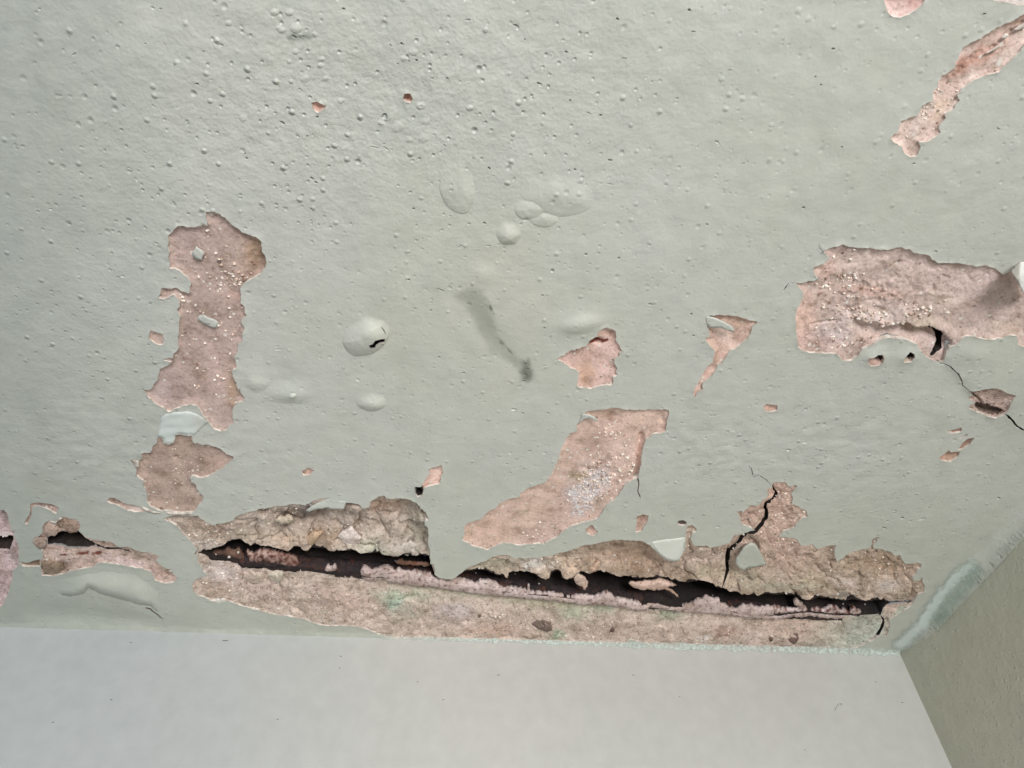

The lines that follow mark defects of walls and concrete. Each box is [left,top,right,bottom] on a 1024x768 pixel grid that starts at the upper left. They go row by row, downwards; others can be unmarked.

peeling [884,0,1024,165]
spalling [795,244,1024,366]
spalling [107,212,925,652]
crack [940,362,969,391]
spalling [969,388,1016,419]
crack [1005,414,1024,431]
spalling [0,503,178,607]